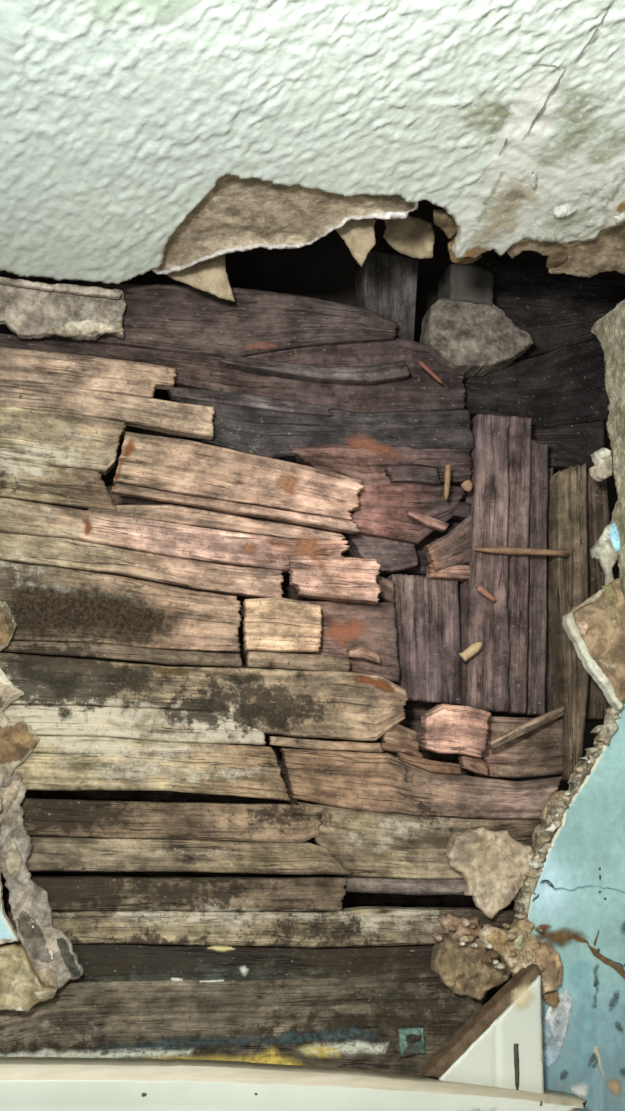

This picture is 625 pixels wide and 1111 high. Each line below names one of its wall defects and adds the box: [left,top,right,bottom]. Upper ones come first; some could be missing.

crack [499,0,615,155]
water stain [543,92,625,165]
spalling [0,168,625,342]
water stain [465,182,535,257]
spalling [153,389,170,401]
water stain [4,583,175,645]
water stain [202,699,286,729]
water stain [229,674,262,685]
spalling [445,475,625,951]
spalling [0,668,84,1012]
crack [532,880,625,902]
peeling [542,990,573,1069]